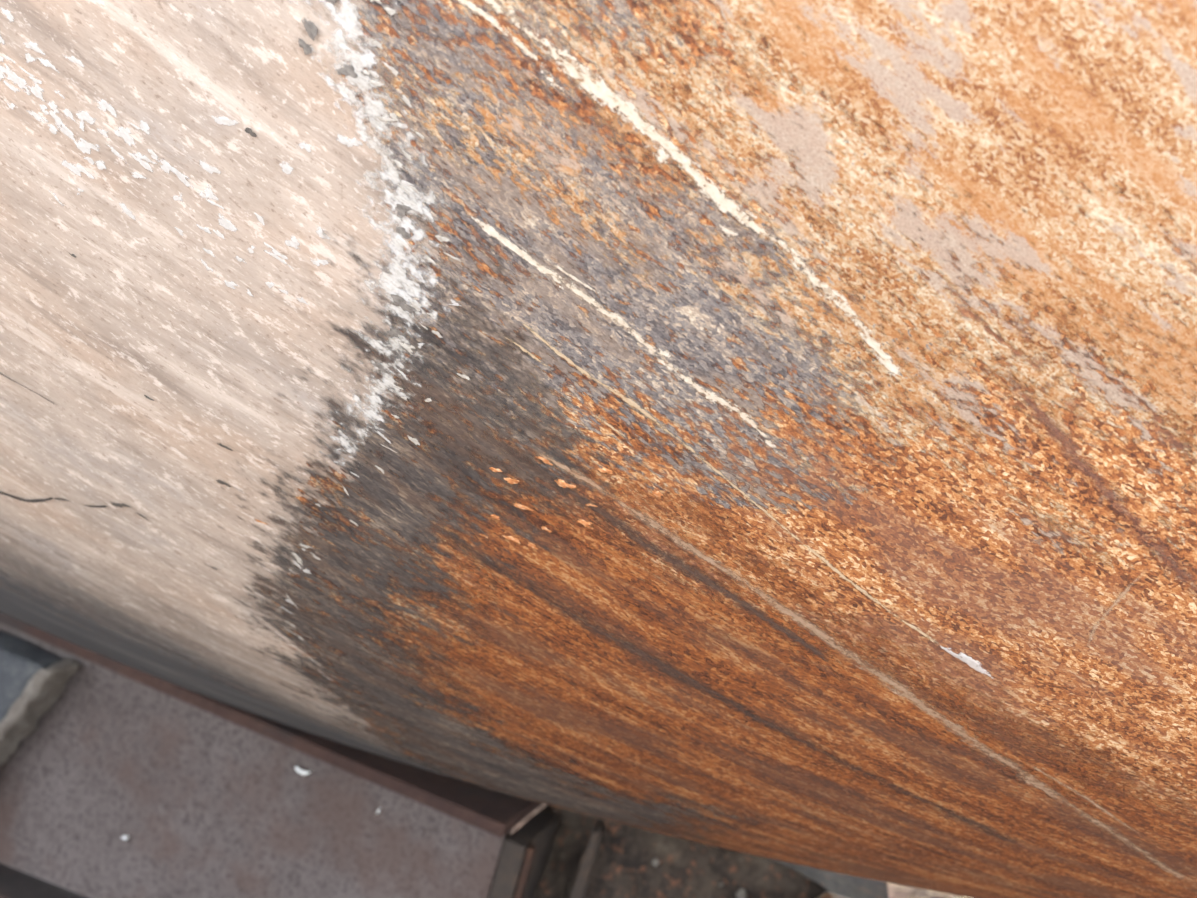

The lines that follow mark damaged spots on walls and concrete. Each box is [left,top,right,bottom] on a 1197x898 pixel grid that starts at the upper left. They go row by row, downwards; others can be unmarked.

peeling [0,34,238,239]
peeling [212,116,257,137]
peeling [201,248,253,296]
peeling [236,236,299,268]
corrosion [261,0,1197,898]
crack [0,492,107,508]
leakage [239,289,1014,844]